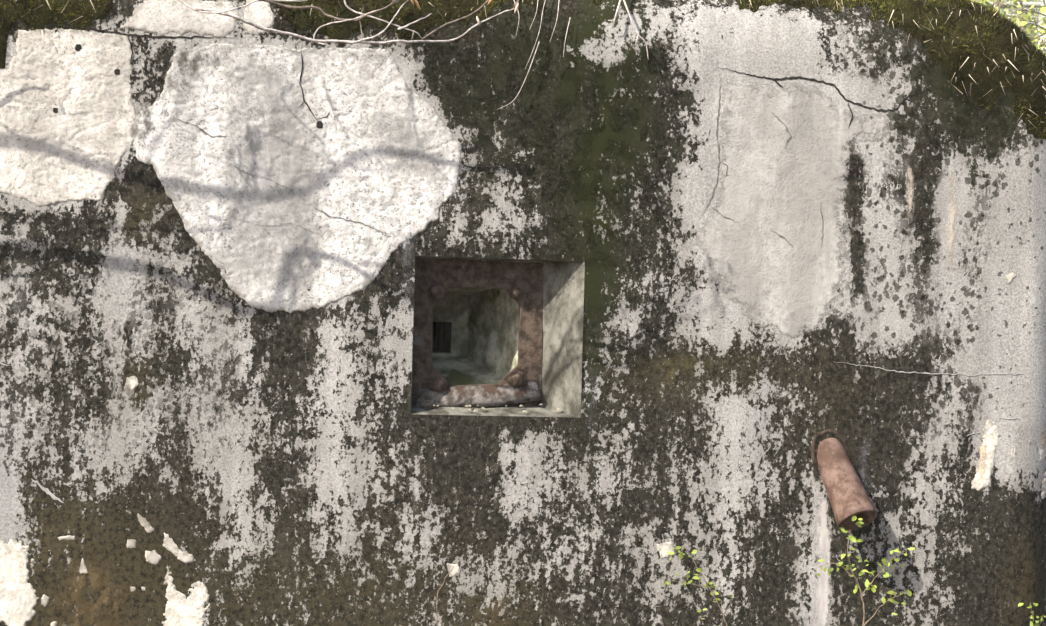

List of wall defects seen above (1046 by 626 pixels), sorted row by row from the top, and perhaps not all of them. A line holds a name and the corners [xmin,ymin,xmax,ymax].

spalling [0,0,462,313]
water stain [230,69,310,281]
crack [697,66,932,222]
efflorescence [971,419,1000,491]
water stain [0,538,49,626]
water stain [137,514,210,626]
water stain [810,497,832,626]